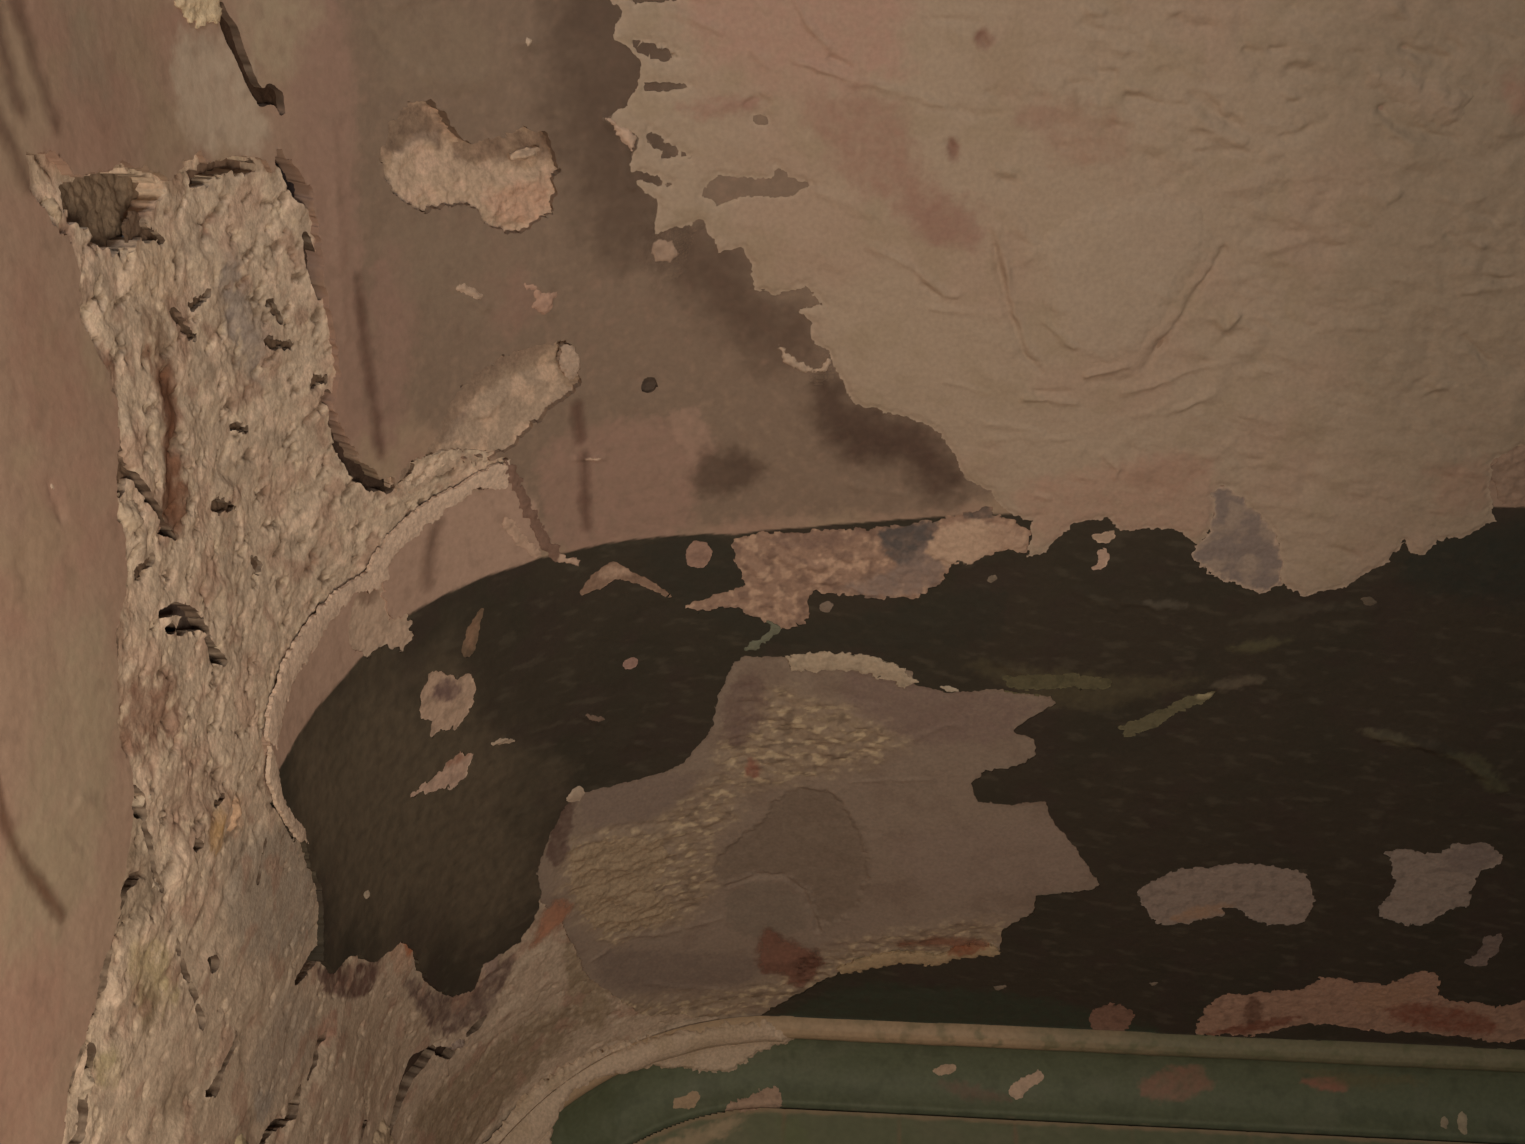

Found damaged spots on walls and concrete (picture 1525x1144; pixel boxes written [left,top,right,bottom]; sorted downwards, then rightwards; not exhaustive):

flaking render [174,0,222,29]
flaking render [380,101,557,231]
damp [821,382,959,489]
flaking render [26,154,1112,1144]
peeling [1137,863,1316,926]
peeling [1378,842,1503,926]
peeling [1464,933,1503,967]
peeling [1195,971,1525,1043]